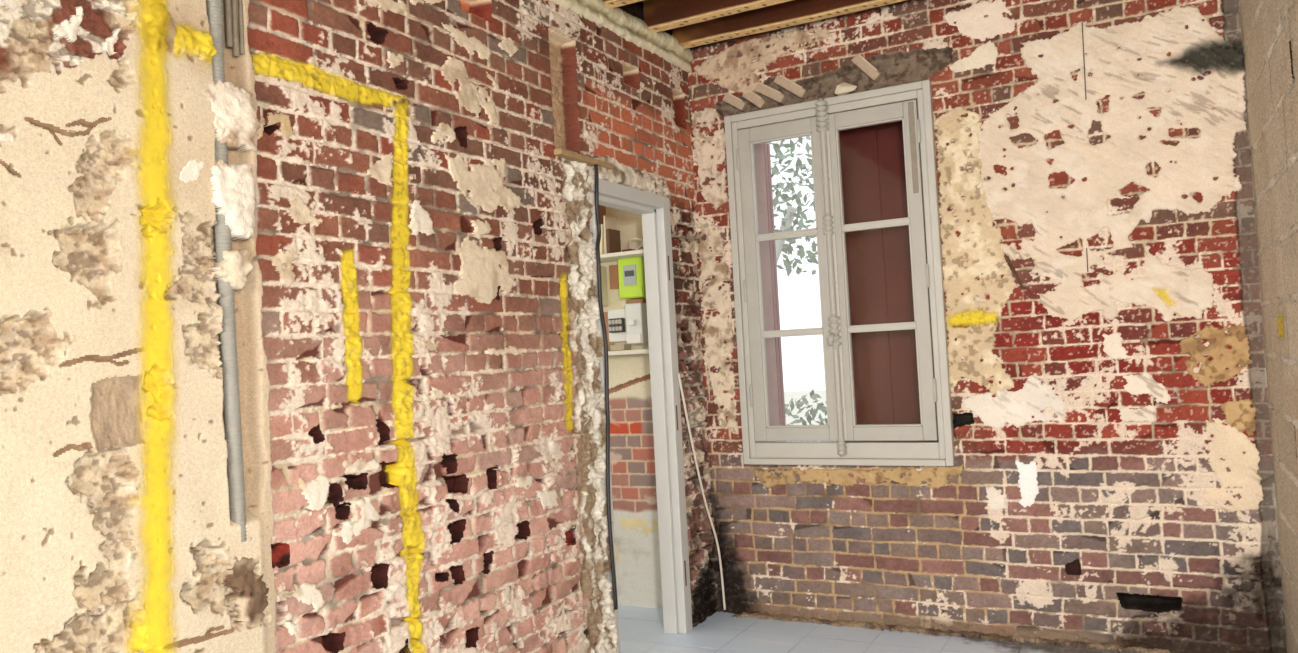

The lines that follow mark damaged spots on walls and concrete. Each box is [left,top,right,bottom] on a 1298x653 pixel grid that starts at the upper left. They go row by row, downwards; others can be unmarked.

peeling [694,28,831,95]
crack [1288,40,1296,83]
spalling [47,129,140,310]
peeling [408,200,435,236]
peeling [430,23,521,304]
peeling [672,89,739,434]
peeling [934,0,1252,429]
peeling [298,419,399,544]
spalling [441,453,469,545]
peeling [986,460,1039,511]
peeling [1199,399,1264,513]
spalling [370,563,390,590]